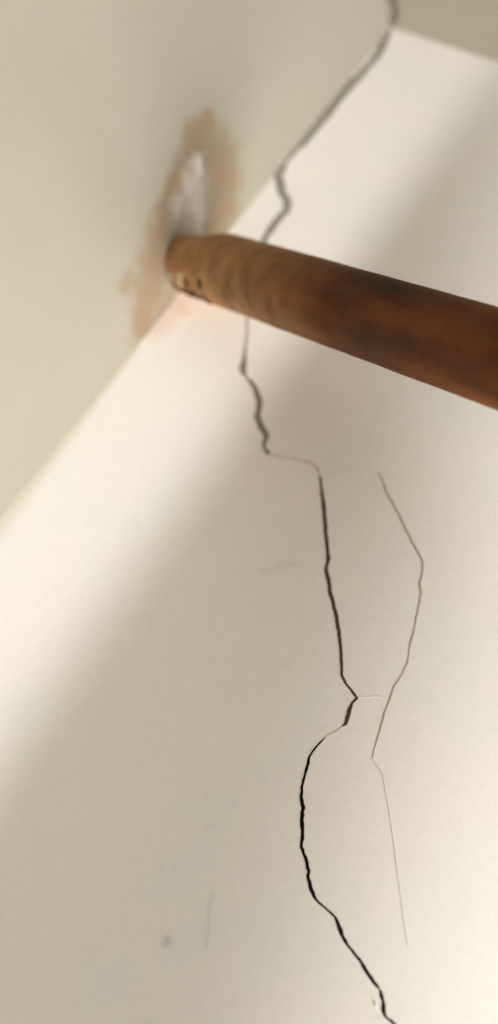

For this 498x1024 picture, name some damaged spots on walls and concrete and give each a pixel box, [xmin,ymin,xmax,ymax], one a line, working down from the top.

crack [260,0,400,243]
leakage [139,292,200,351]
crack [239,317,424,1024]